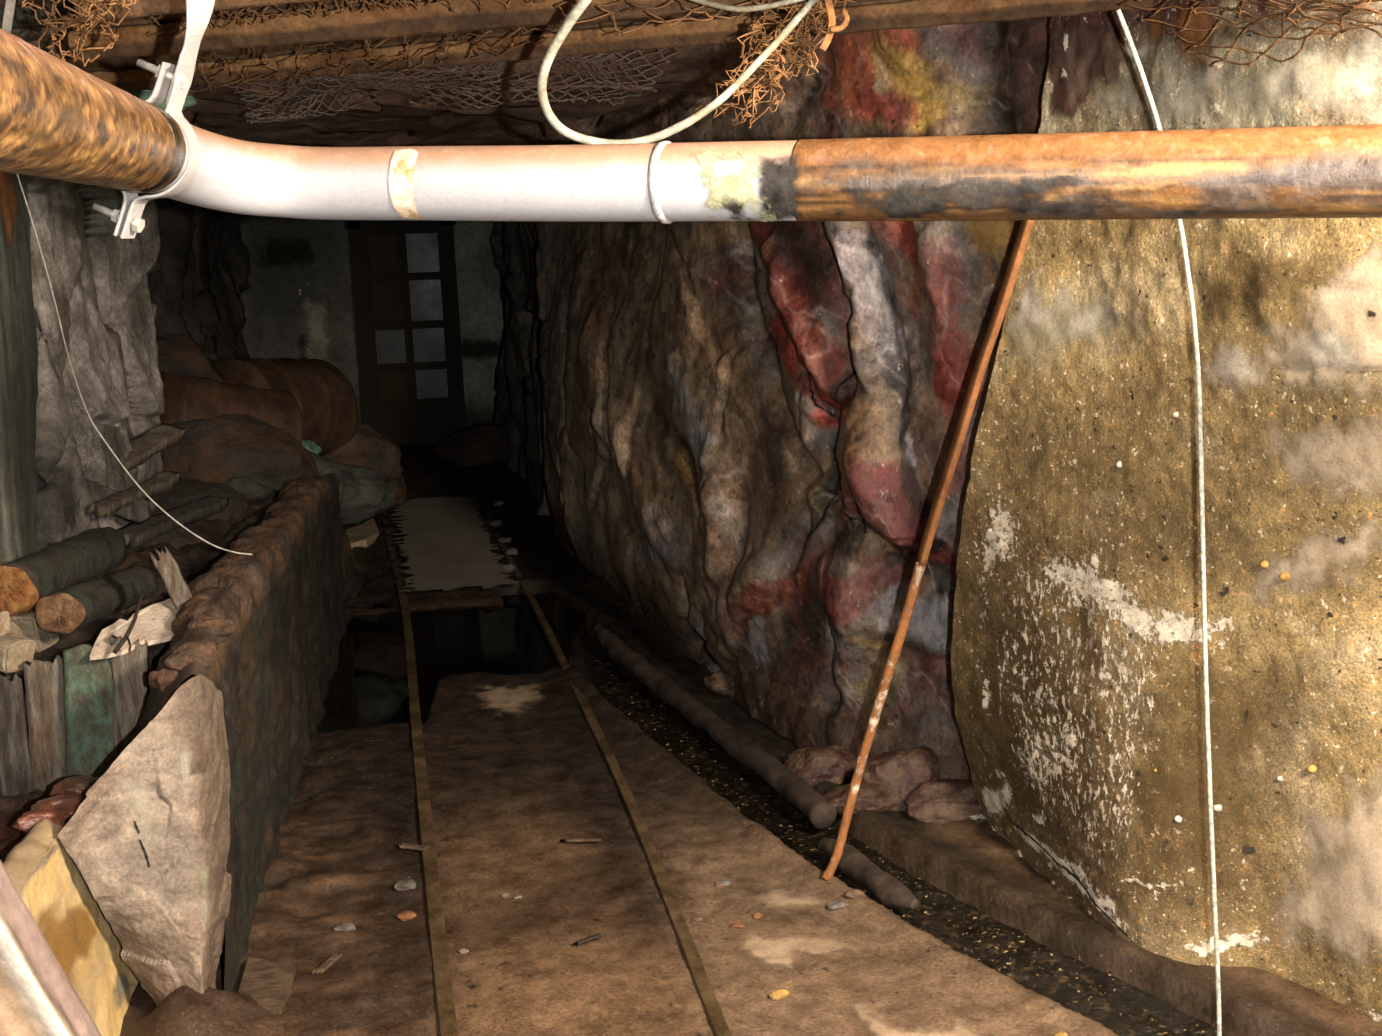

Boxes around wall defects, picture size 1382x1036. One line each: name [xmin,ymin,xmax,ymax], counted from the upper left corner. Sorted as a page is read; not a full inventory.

damp [904,595,951,650]
damp [969,494,1275,865]
crack [1000,811,1176,936]
efflorescence [1182,933,1270,957]